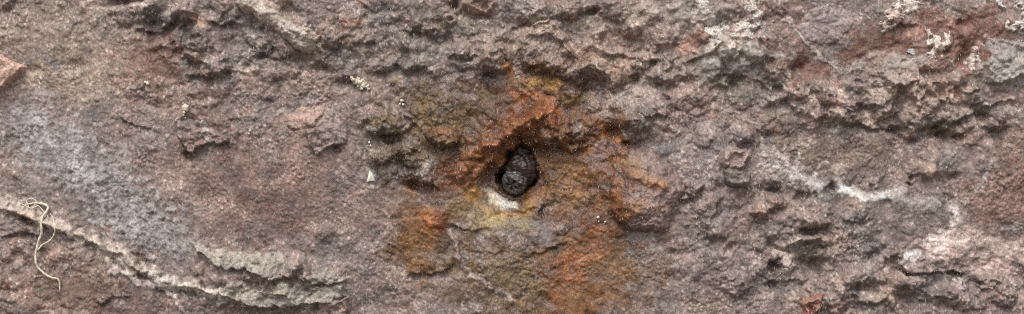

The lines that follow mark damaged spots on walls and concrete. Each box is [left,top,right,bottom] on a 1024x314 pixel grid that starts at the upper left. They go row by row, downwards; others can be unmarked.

corrosion [390,207,443,250]
corrosion [412,63,638,314]